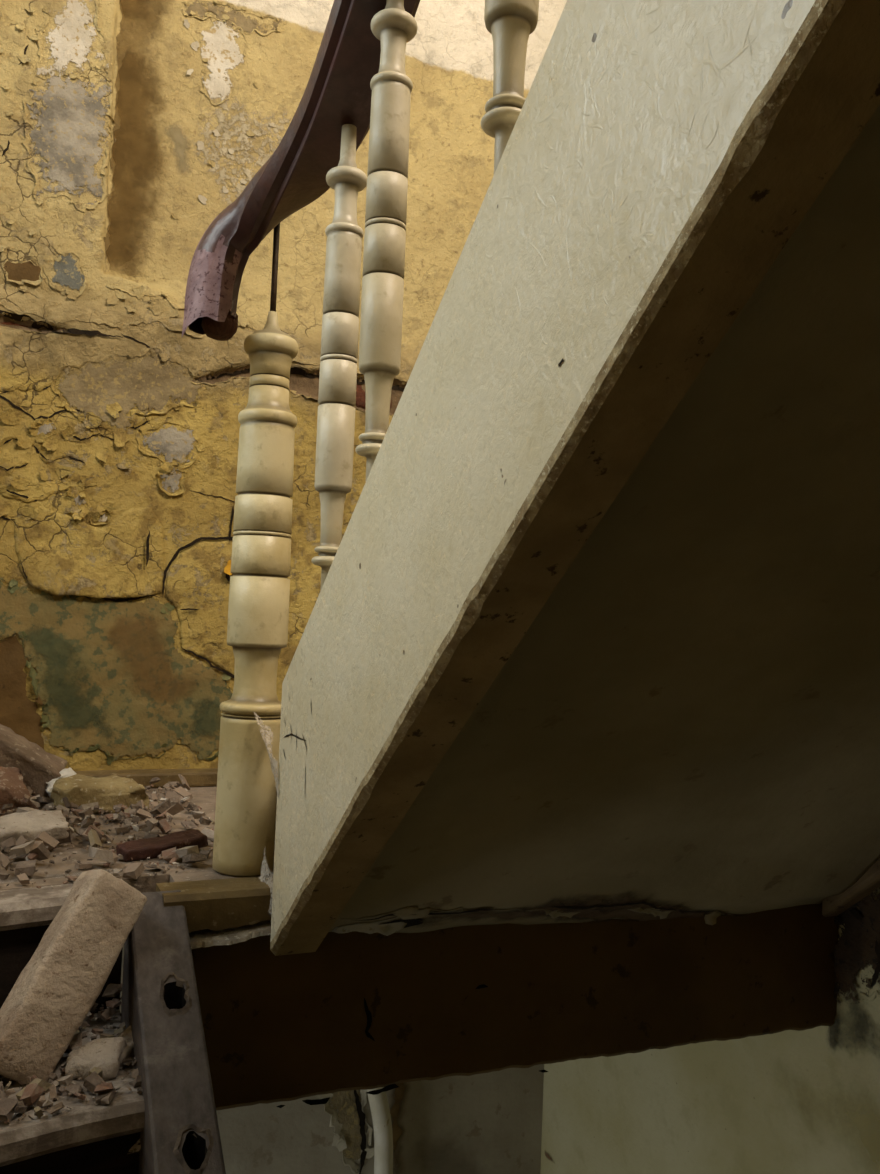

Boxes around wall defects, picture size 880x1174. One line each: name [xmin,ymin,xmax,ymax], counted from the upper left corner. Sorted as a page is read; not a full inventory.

peeling [2,0,116,212]
peeling [0,244,87,300]
spalling [0,302,123,338]
crack [122,320,205,350]
spalling [289,356,320,400]
spalling [354,370,366,413]
spalling [389,378,407,416]
peeling [29,346,250,496]
water stain [25,628,111,737]
water stain [194,700,220,736]
peeling [332,902,676,936]
spalling [834,887,880,1004]